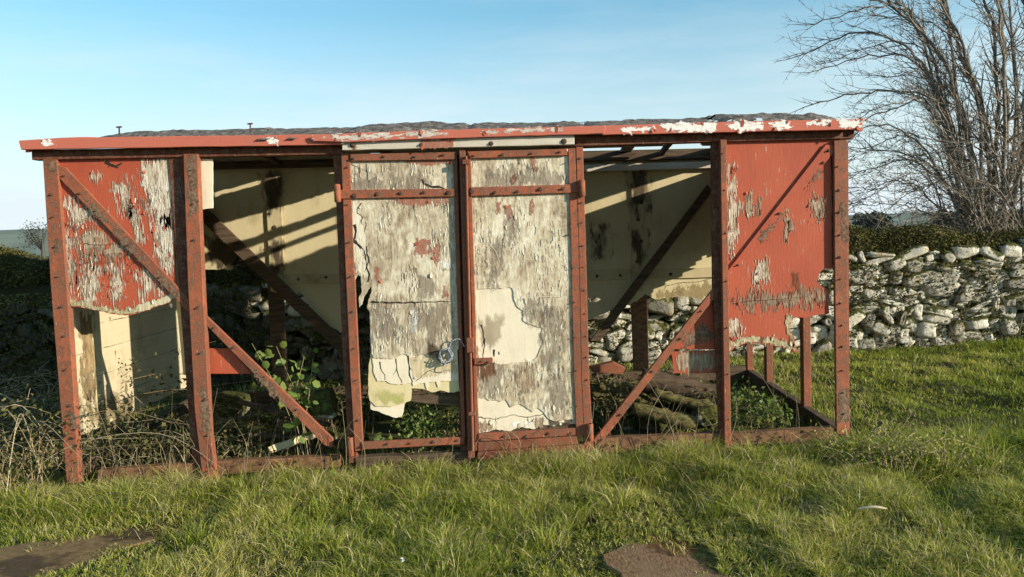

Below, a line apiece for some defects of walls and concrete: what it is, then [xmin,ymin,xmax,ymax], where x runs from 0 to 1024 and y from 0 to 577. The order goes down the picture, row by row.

peeling [481,125,563,136]
peeling [621,119,793,135]
peeling [806,118,864,130]
peeling [809,168,851,243]
peeling [54,158,185,311]
peeling [352,199,381,283]
peeling [727,161,797,286]
peeling [729,318,744,341]
peeling [510,363,542,396]